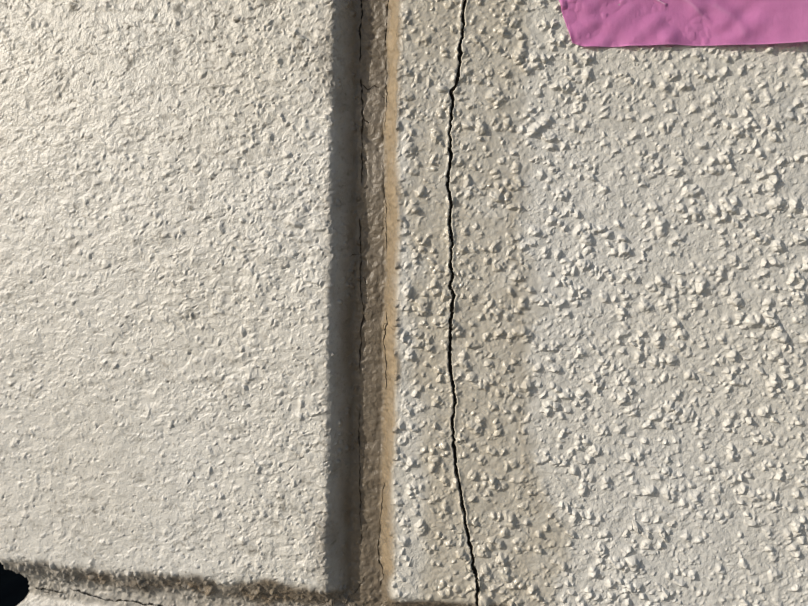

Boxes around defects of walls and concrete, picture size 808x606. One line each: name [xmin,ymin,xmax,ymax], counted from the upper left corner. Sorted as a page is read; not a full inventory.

crack [357,0,365,60]
crack [360,65,388,183]
crack [351,219,366,366]
crack [381,312,389,389]
crack [446,0,479,606]
crack [355,413,384,593]
crack [35,588,160,606]